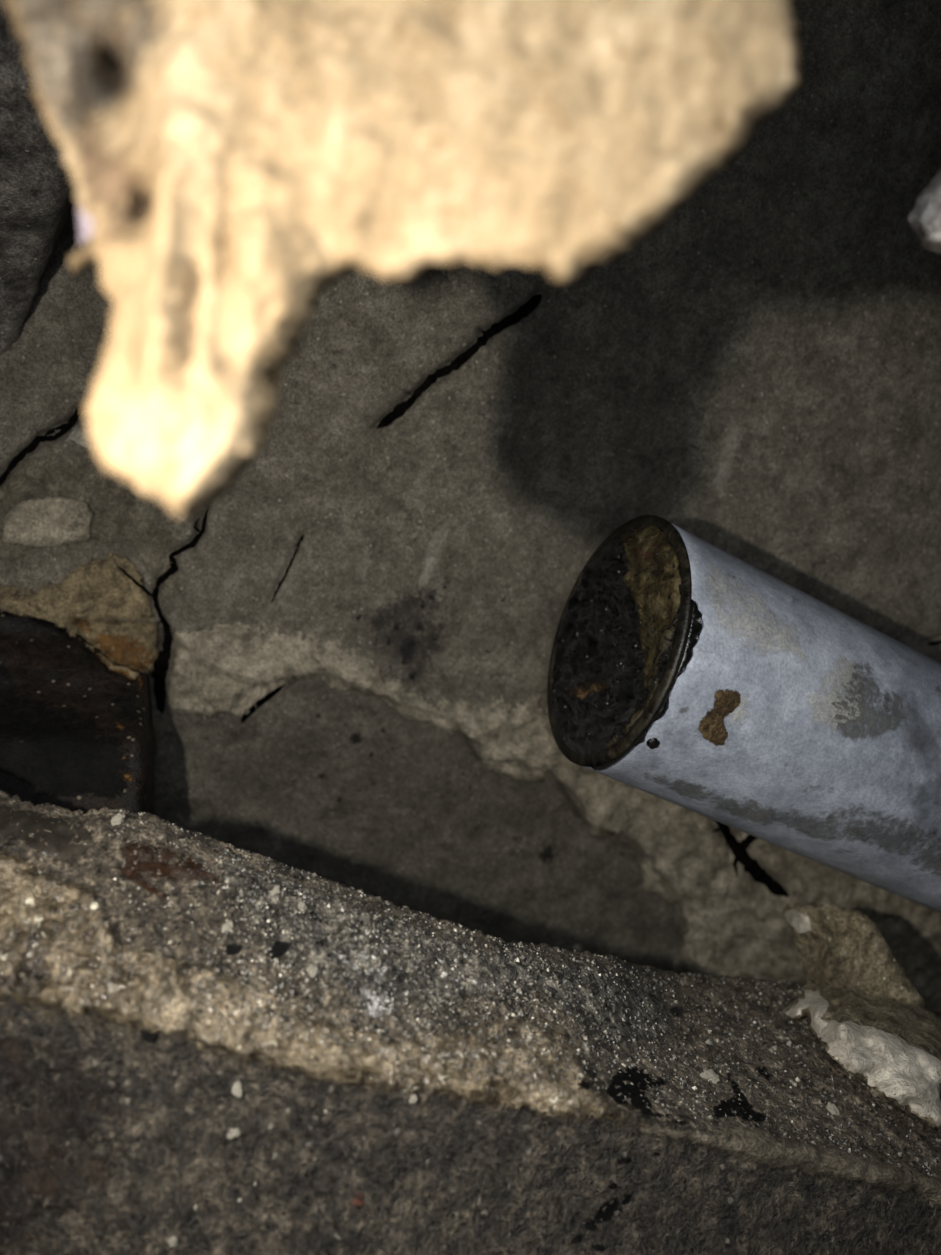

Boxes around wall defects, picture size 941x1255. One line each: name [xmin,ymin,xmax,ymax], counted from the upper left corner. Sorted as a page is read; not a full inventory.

crack [376,294,542,429]
crack [0,404,86,486]
crack [117,506,209,713]
crack [270,534,304,603]
corrosion [698,689,741,746]
crack [712,821,790,897]